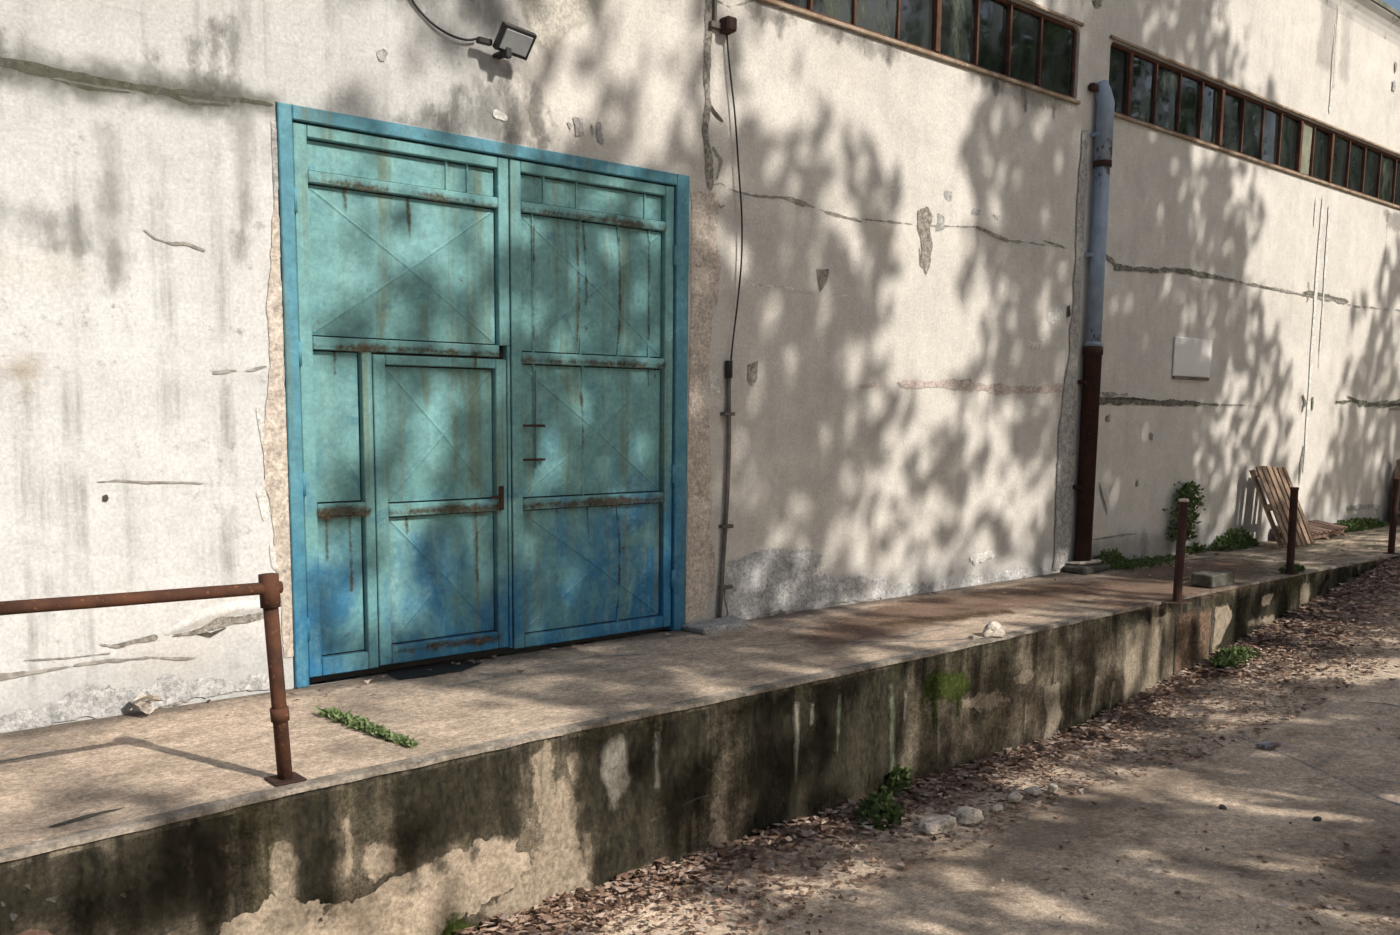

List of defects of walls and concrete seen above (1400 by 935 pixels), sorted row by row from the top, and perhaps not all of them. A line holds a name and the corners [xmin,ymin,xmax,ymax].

leakage [0,61,270,109]
leakage [493,109,508,121]
crack [702,0,1065,249]
peeling [685,130,1089,622]
crack [1099,197,1400,485]
crack [0,611,264,681]
peeling [219,740,595,935]
leakage [394,751,551,871]
leakage [571,711,716,889]
leakage [744,669,906,841]
leakage [930,680,939,752]
leakage [445,913,460,935]